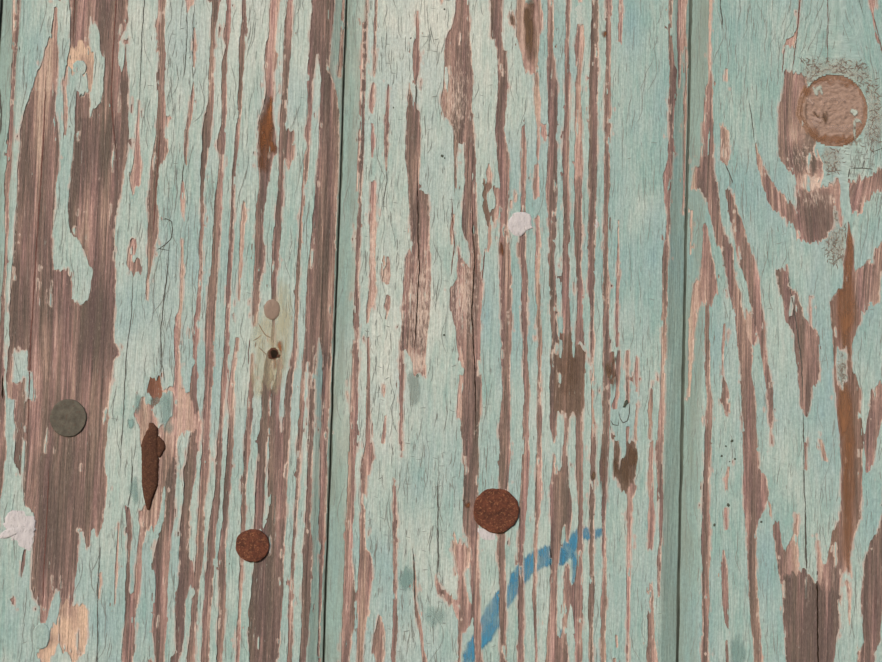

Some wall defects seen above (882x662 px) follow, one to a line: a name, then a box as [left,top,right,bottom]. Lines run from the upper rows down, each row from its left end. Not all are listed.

peeling [0,0,172,662]
peeling [110,0,345,662]
peeling [435,0,882,662]